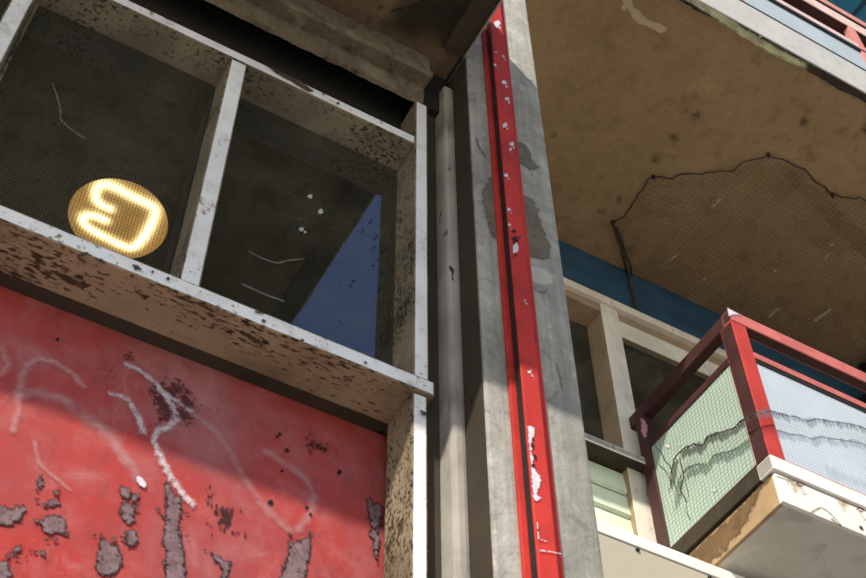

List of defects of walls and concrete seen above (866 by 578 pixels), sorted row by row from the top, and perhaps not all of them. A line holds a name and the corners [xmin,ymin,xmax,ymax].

peeling [527,426,542,501]
peeling [0,474,70,578]
peeling [93,476,147,578]
peeling [155,480,191,578]
peeling [204,549,232,578]
peeling [204,485,246,538]
peeling [279,531,314,578]